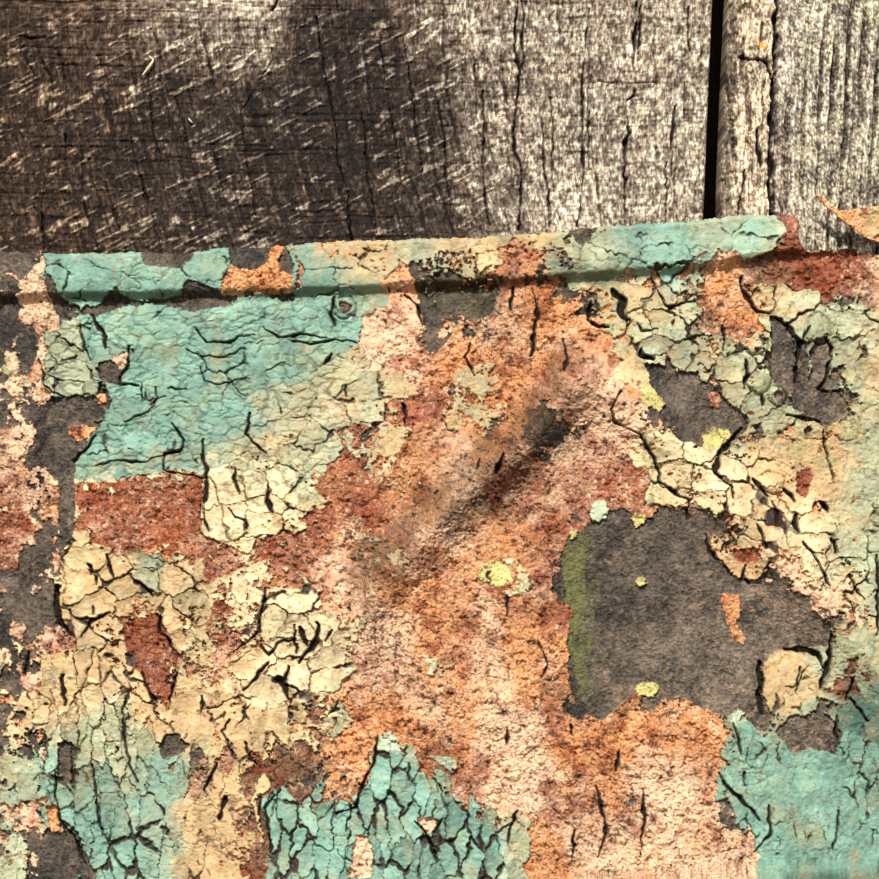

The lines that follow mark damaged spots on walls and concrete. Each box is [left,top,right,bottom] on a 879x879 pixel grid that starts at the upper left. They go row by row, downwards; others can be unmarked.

crack [73,297,358,535]
rust [405,277,586,410]
crack [587,289,658,362]
crack [610,391,691,521]
rust [707,389,722,409]
crack [739,277,840,394]
rust [702,235,879,334]
peeling [0,214,879,879]
crack [712,414,879,636]
crack [53,554,179,710]
crack [234,587,333,701]
rust [328,401,755,879]